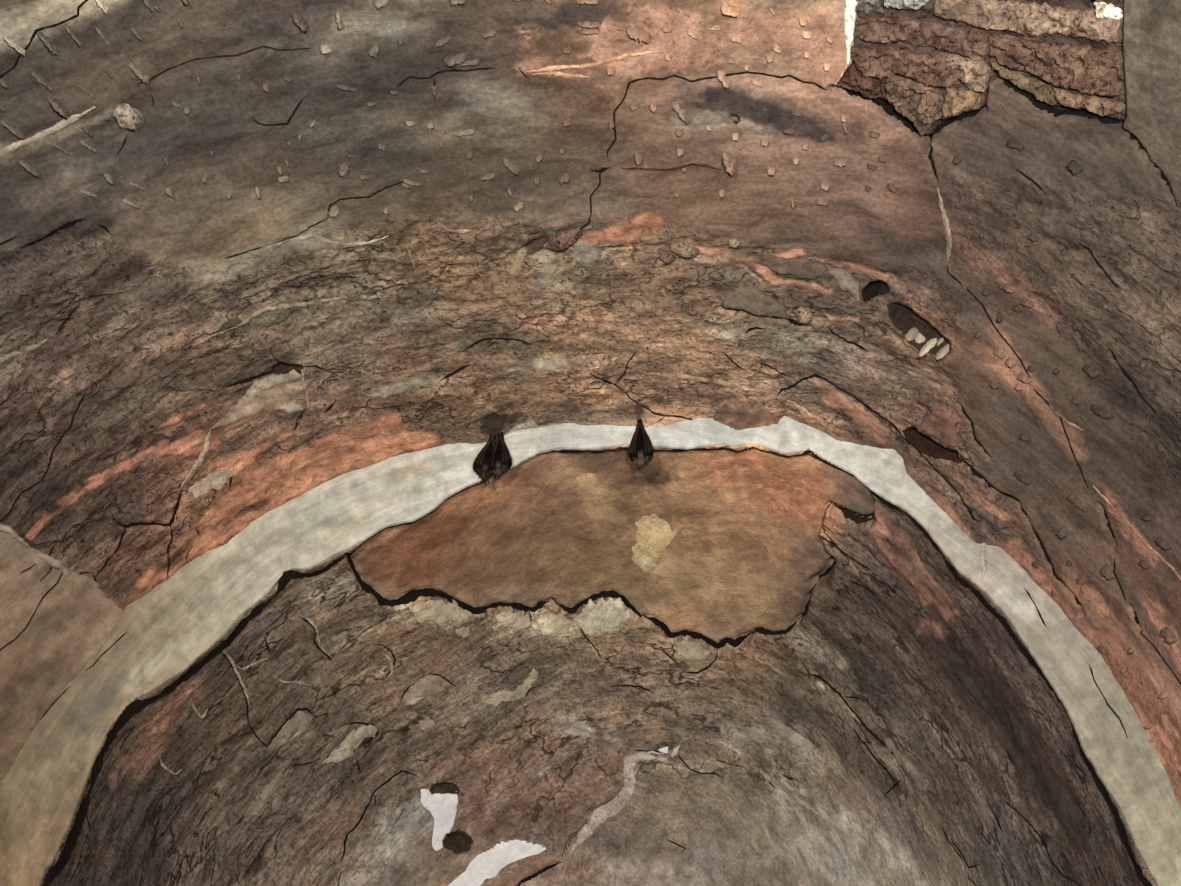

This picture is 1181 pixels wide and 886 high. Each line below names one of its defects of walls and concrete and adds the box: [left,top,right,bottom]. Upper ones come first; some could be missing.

crack [0,0,88,79]
flaking render [516,0,1127,136]
crack [580,71,1175,229]
crack [0,220,112,246]
crack [1078,243,1122,290]
crack [947,265,1181,685]
spalling [420,722,680,886]